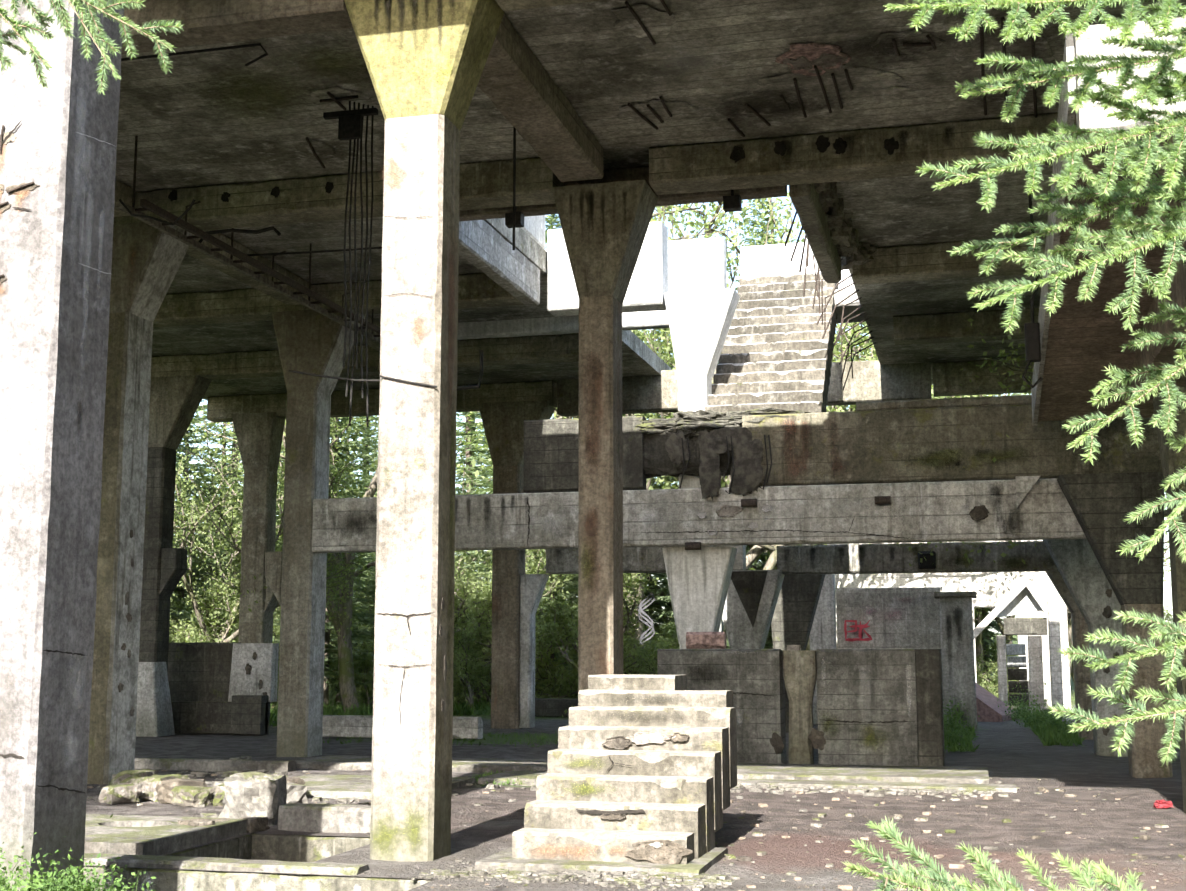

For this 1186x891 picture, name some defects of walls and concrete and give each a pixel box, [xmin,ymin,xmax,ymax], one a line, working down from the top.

water stain [375,0,454,37]
spalling [871,30,946,56]
spalling [956,16,1054,118]
spalling [722,65,911,163]
water stain [570,192,627,230]
crack [377,612,435,636]
crack [379,664,432,732]
spalling [602,732,690,750]
spalling [625,840,693,864]